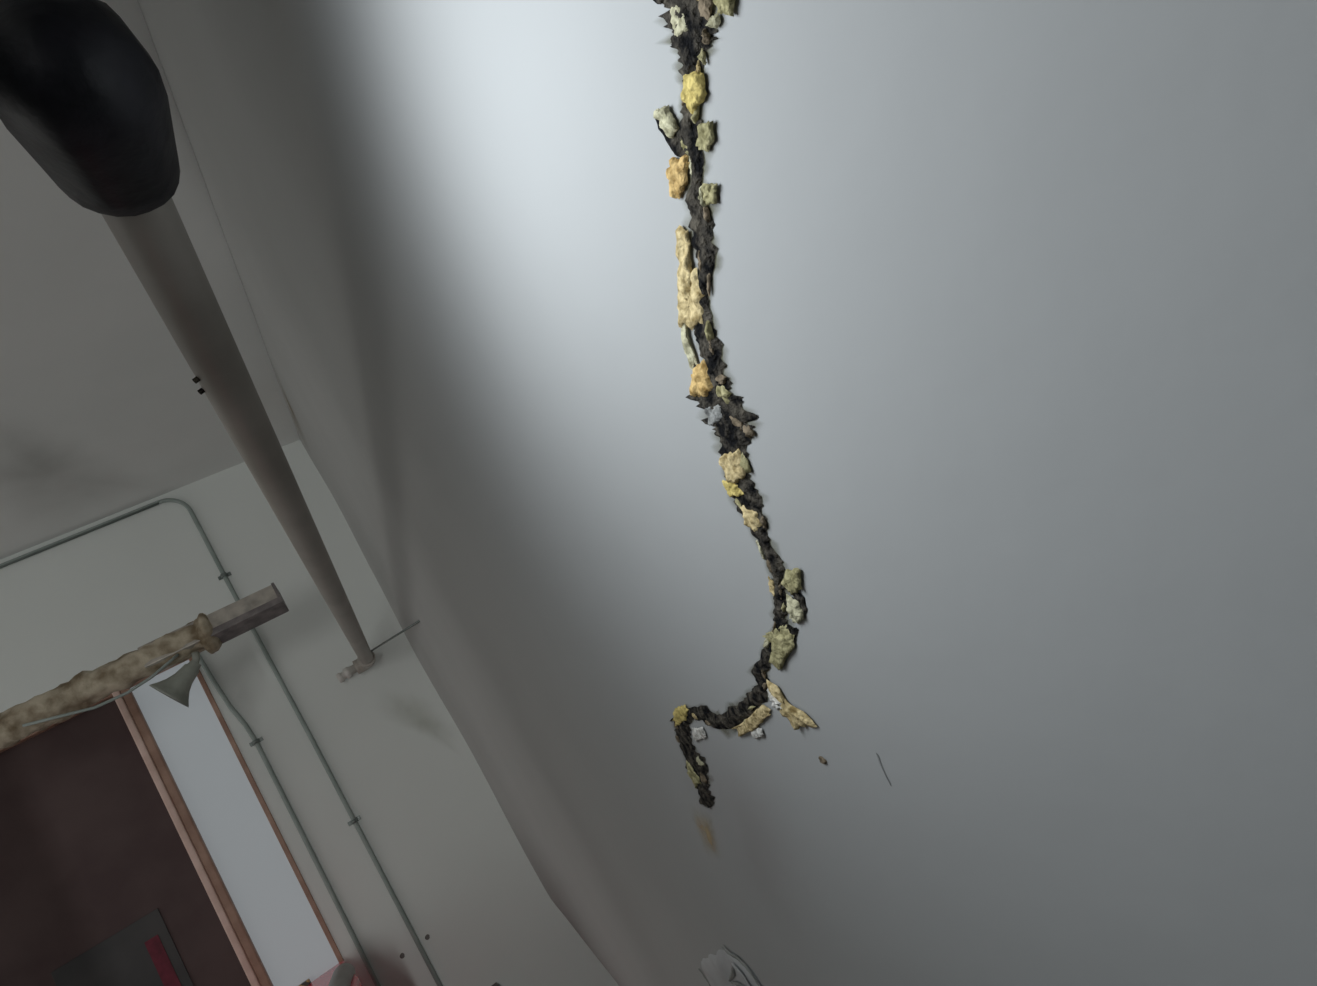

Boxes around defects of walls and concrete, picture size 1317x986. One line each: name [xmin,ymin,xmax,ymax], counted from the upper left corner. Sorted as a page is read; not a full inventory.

crack [653,0,817,808]